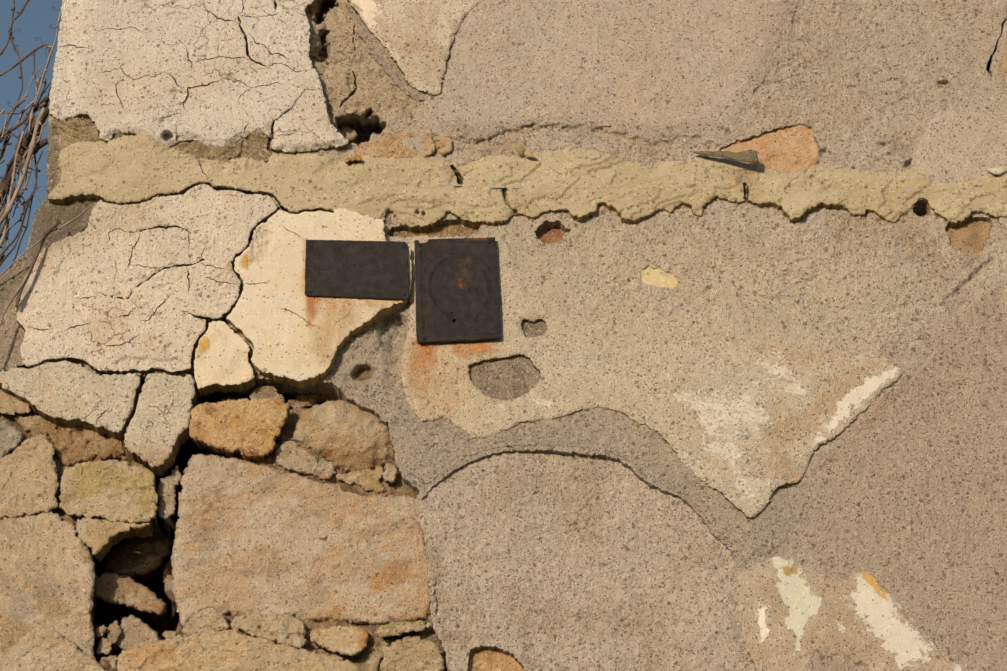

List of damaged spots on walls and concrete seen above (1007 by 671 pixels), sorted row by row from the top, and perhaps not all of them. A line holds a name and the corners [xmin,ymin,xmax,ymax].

crack [60,27,143,49]
crack [98,0,300,141]
flaking render [347,0,797,131]
crack [199,164,325,246]
peeling [693,149,759,164]
crack [32,228,266,385]
peeling [811,367,902,448]
spalling [395,347,823,671]